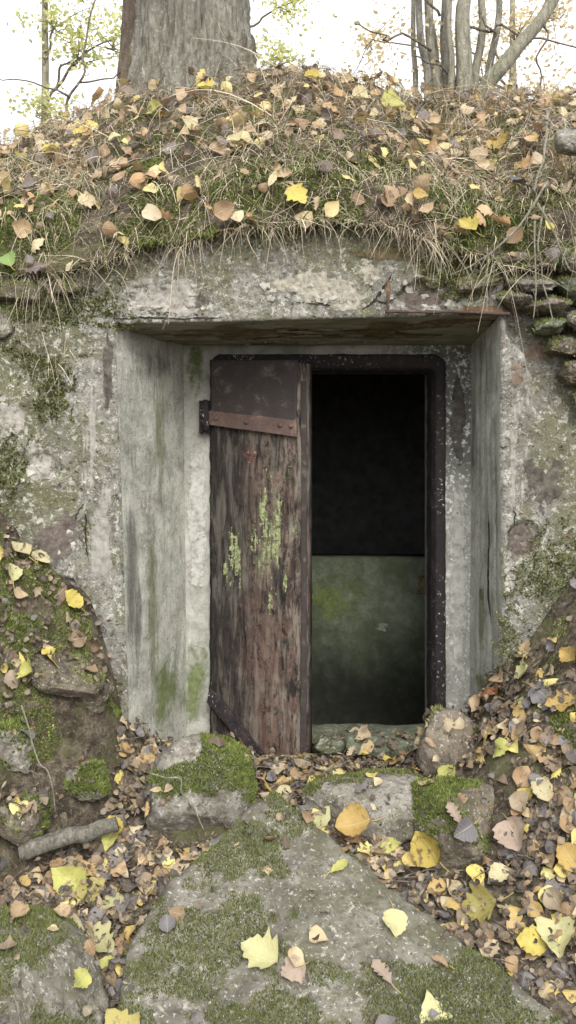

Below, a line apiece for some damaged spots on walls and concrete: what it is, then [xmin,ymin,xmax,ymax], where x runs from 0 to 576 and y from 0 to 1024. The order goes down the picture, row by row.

rust [385,280,510,326]
leakage [128,525,141,651]
crack [485,521,493,623]